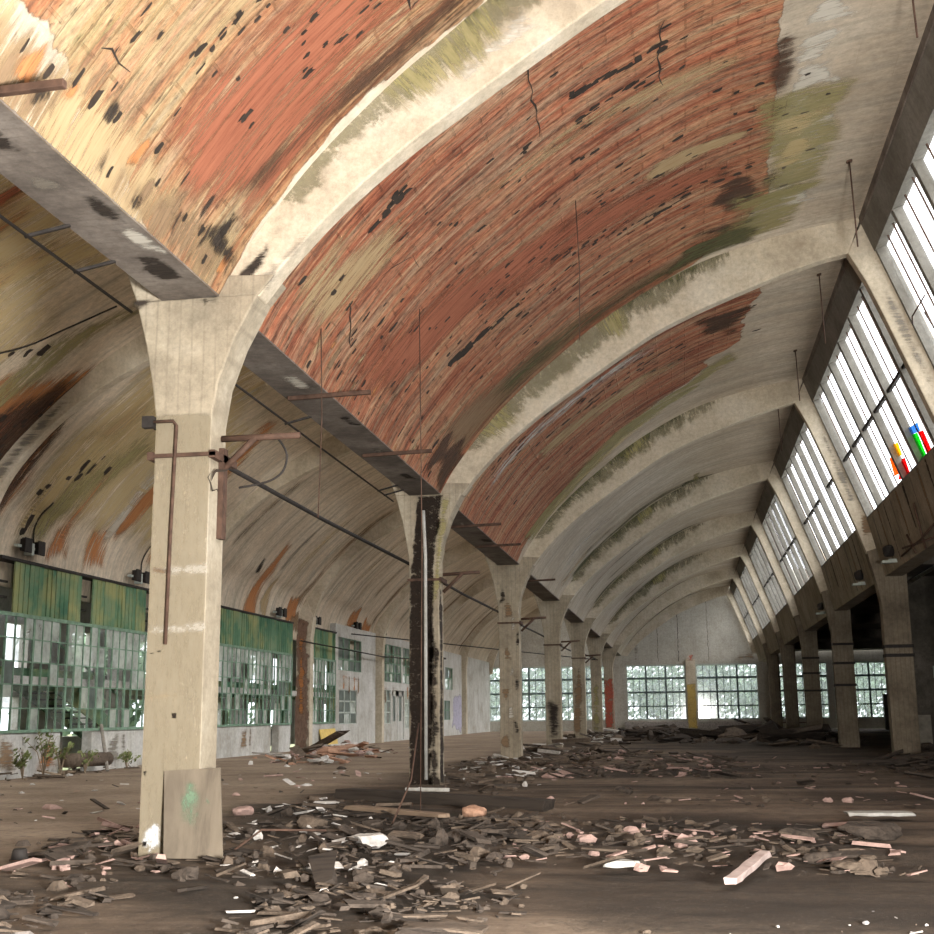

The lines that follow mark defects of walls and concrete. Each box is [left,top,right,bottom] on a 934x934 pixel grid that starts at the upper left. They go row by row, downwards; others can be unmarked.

peeling [16,0,484,294]
water stain [283,0,539,201]
crack [527,70,540,137]
peeling [259,0,856,493]
crack [646,20,665,85]
water stain [468,81,853,450]
peeling [459,286,763,561]